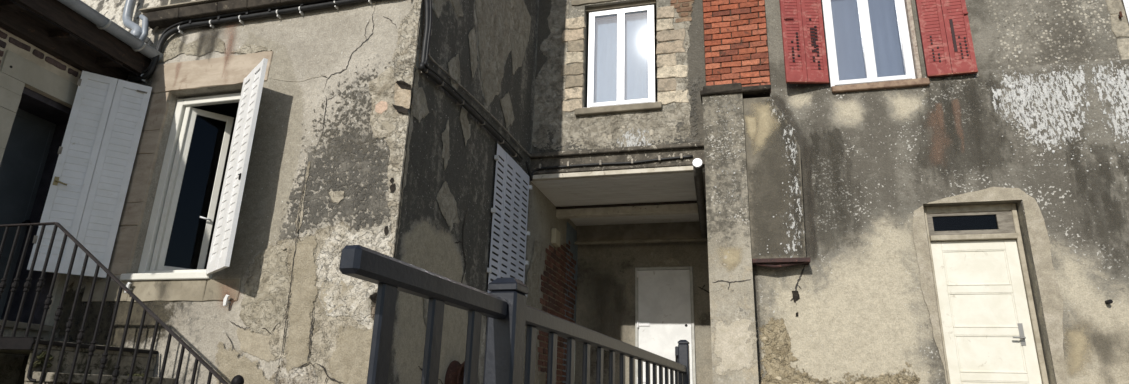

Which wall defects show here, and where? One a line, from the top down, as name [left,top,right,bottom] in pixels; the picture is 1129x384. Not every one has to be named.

crack [226,3,397,383]
peeling [258,0,694,384]
efflorescence [991,60,1129,172]